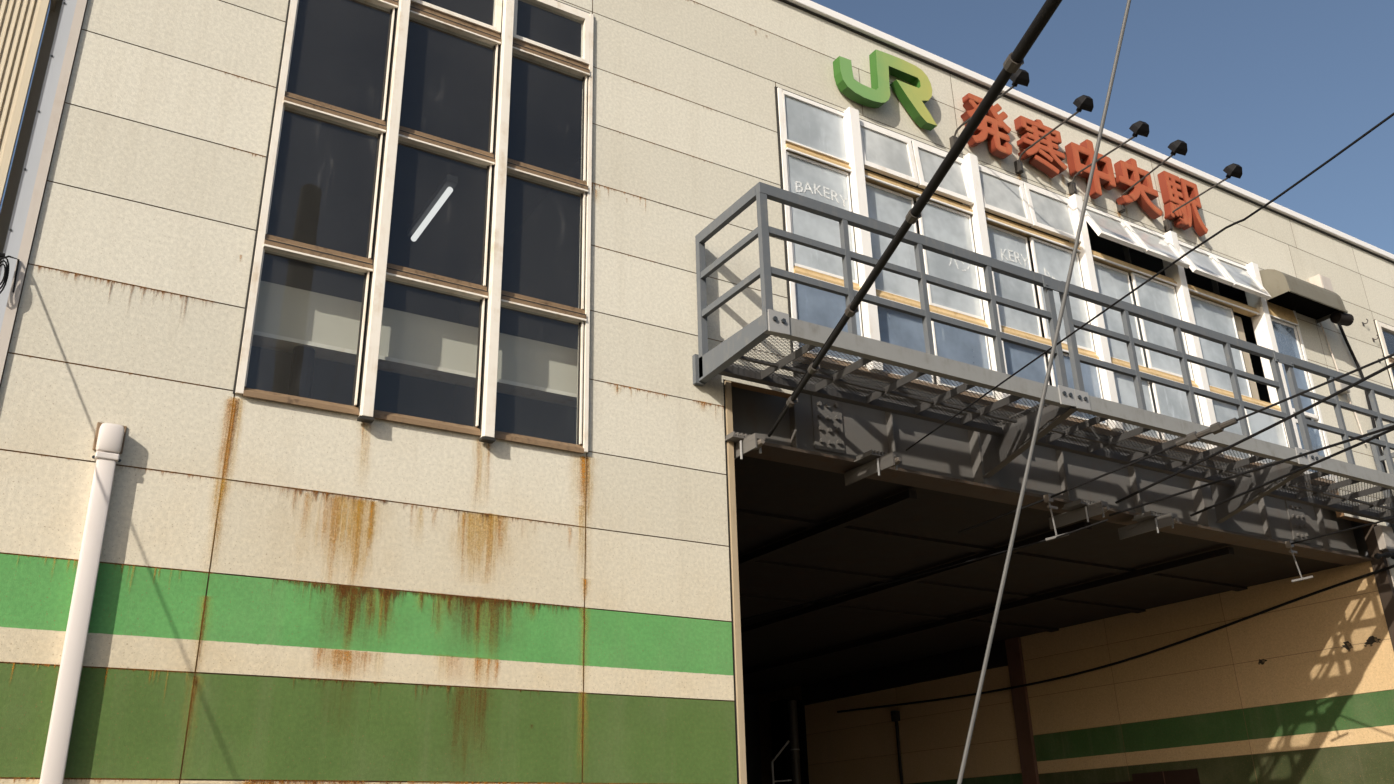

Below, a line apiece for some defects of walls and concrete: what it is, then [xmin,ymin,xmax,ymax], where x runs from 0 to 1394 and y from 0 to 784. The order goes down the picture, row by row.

corrosion [288,487,386,550]
corrosion [288,579,584,626]